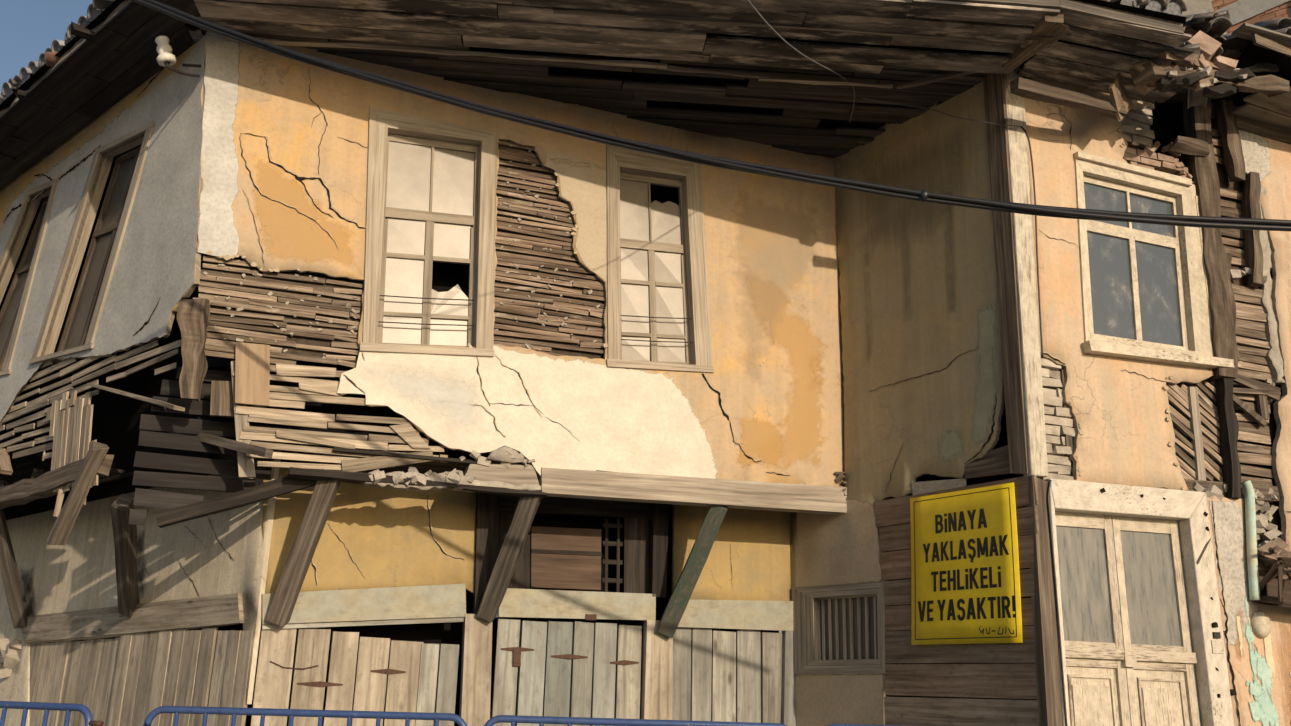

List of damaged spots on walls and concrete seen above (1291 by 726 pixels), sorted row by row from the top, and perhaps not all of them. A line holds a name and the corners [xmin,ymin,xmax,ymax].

crack [239,68,368,262]
peeling [0,31,717,479]
crack [470,355,577,439]
crack [702,372,791,476]
damp [740,278,821,464]
crack [870,347,979,391]
spalling [1040,358,1085,480]
spalling [1117,104,1193,183]
spalling [1163,100,1276,490]
crack [1212,501,1258,726]
peeling [1209,500,1291,726]